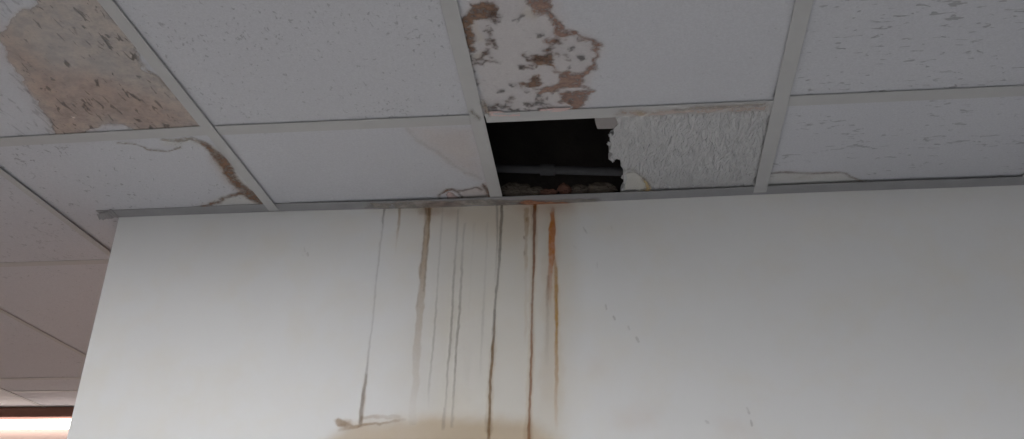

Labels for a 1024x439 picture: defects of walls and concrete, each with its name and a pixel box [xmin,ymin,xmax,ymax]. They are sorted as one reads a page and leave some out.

damp [0,0,263,207]
peeling [461,2,500,65]
peeling [483,0,601,117]